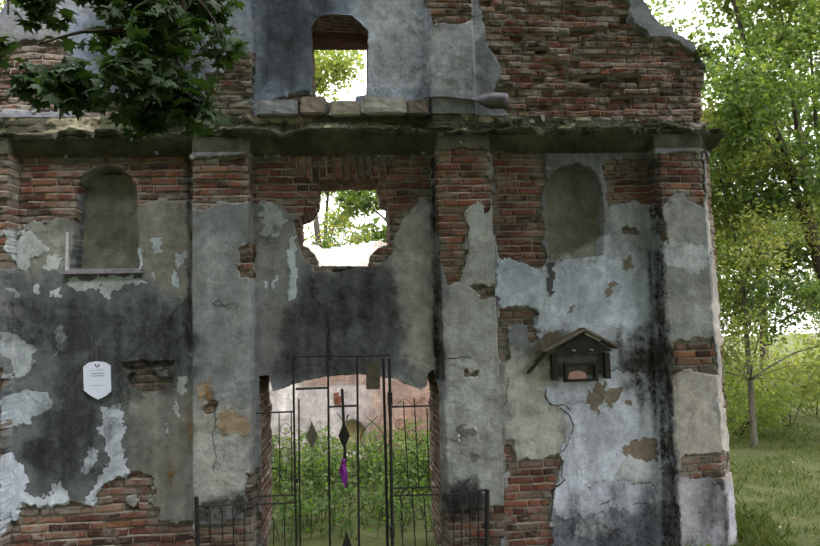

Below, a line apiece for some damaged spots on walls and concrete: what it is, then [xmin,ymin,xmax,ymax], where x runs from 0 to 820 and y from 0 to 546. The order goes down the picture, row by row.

flaking render [0,36,71,113]
flaking render [82,107,122,118]
flaking render [206,52,256,118]
flaking render [424,0,707,128]
peeling [0,141,721,363]
leakage [1,225,194,481]
leakage [556,159,729,546]
flaking render [0,329,262,546]
crack [212,397,231,471]
crack [544,388,574,516]
peeling [441,336,730,546]